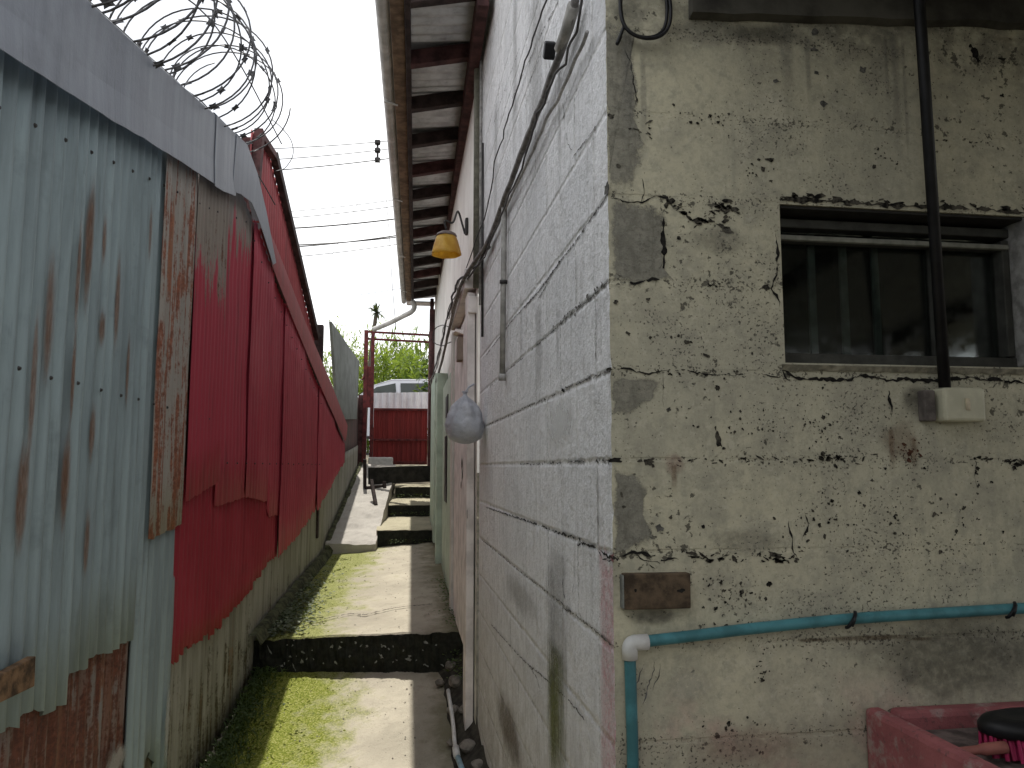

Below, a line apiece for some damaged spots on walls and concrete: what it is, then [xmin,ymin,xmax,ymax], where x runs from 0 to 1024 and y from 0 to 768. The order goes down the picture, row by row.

crack [779,197,1024,215]
rust [75,198,106,316]
rust [100,268,120,339]
crack [487,179,685,373]
crack [767,235,780,306]
rust [16,274,53,539]
crack [490,353,732,424]
crack [763,367,1024,417]
rust [0,641,129,768]